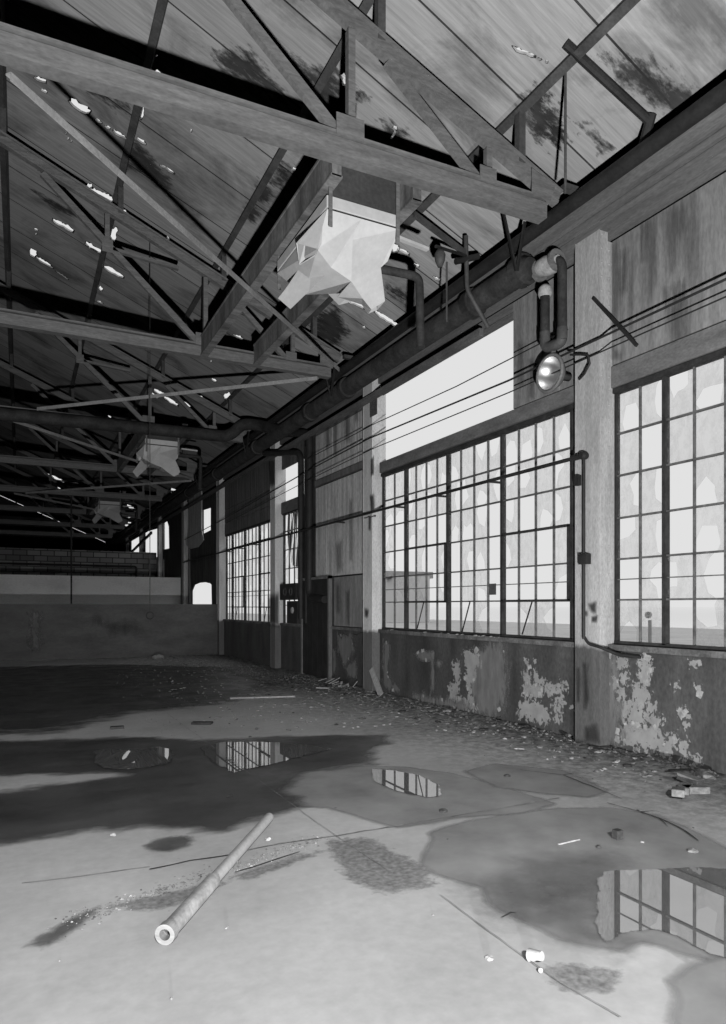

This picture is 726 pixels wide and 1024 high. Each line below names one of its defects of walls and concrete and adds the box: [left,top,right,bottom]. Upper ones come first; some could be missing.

leakage [518,94,564,148]
leakage [609,57,695,113]
peeling [412,633,575,729]
peeling [609,652,704,767]